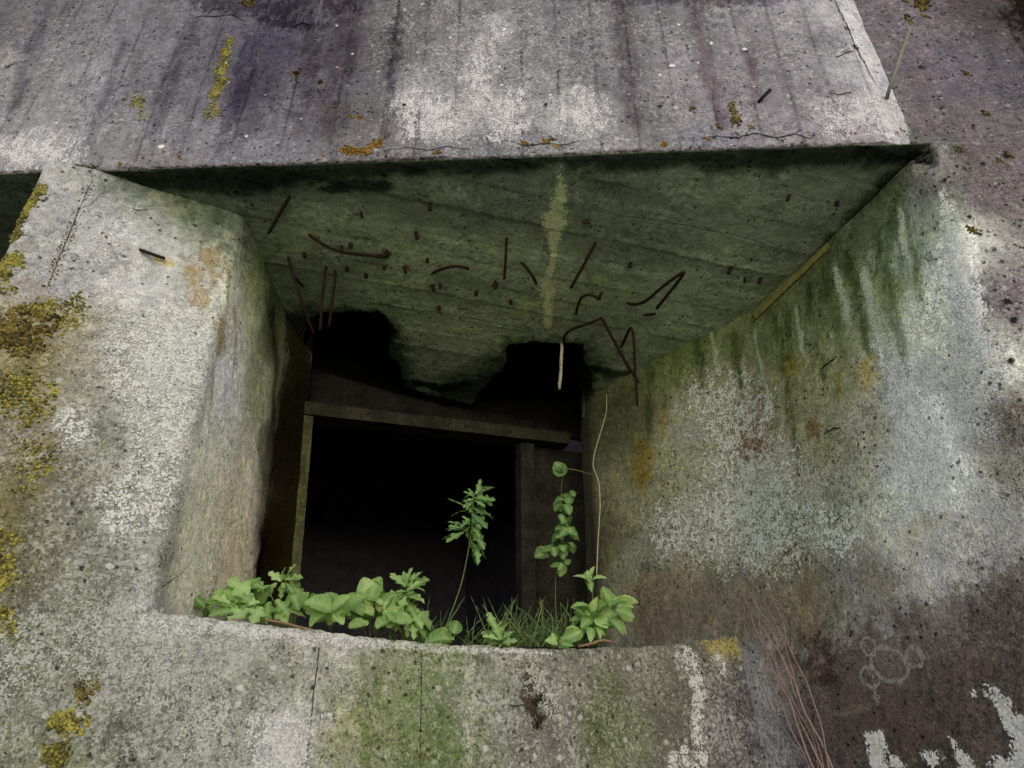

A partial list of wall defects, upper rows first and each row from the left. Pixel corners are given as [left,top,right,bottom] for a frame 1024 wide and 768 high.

leakage [391,13,535,145]
crack [830,1,876,95]
leakage [0,125,90,171]
crack [46,181,100,289]
leakage [105,85,926,330]
spalling [562,242,640,406]
leakage [794,304,806,358]
crack [306,641,320,764]